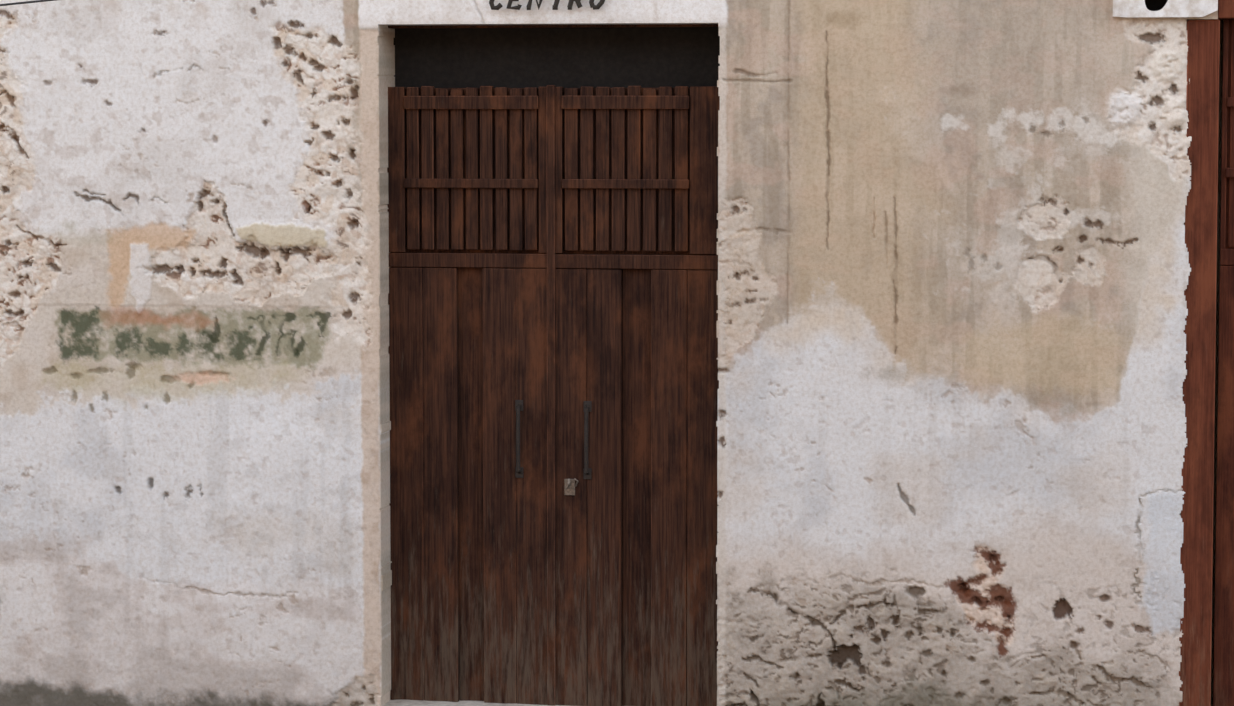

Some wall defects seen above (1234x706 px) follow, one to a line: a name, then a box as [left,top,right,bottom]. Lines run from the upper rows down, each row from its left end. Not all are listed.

flaking render [0,10,67,370]
flaking render [43,21,374,412]
flaking render [718,198,779,365]
flaking render [1014,195,1139,313]
damp [860,359,919,388]
crack [167,583,257,598]
flaking render [851,546,1018,659]
peeling [1132,488,1185,639]